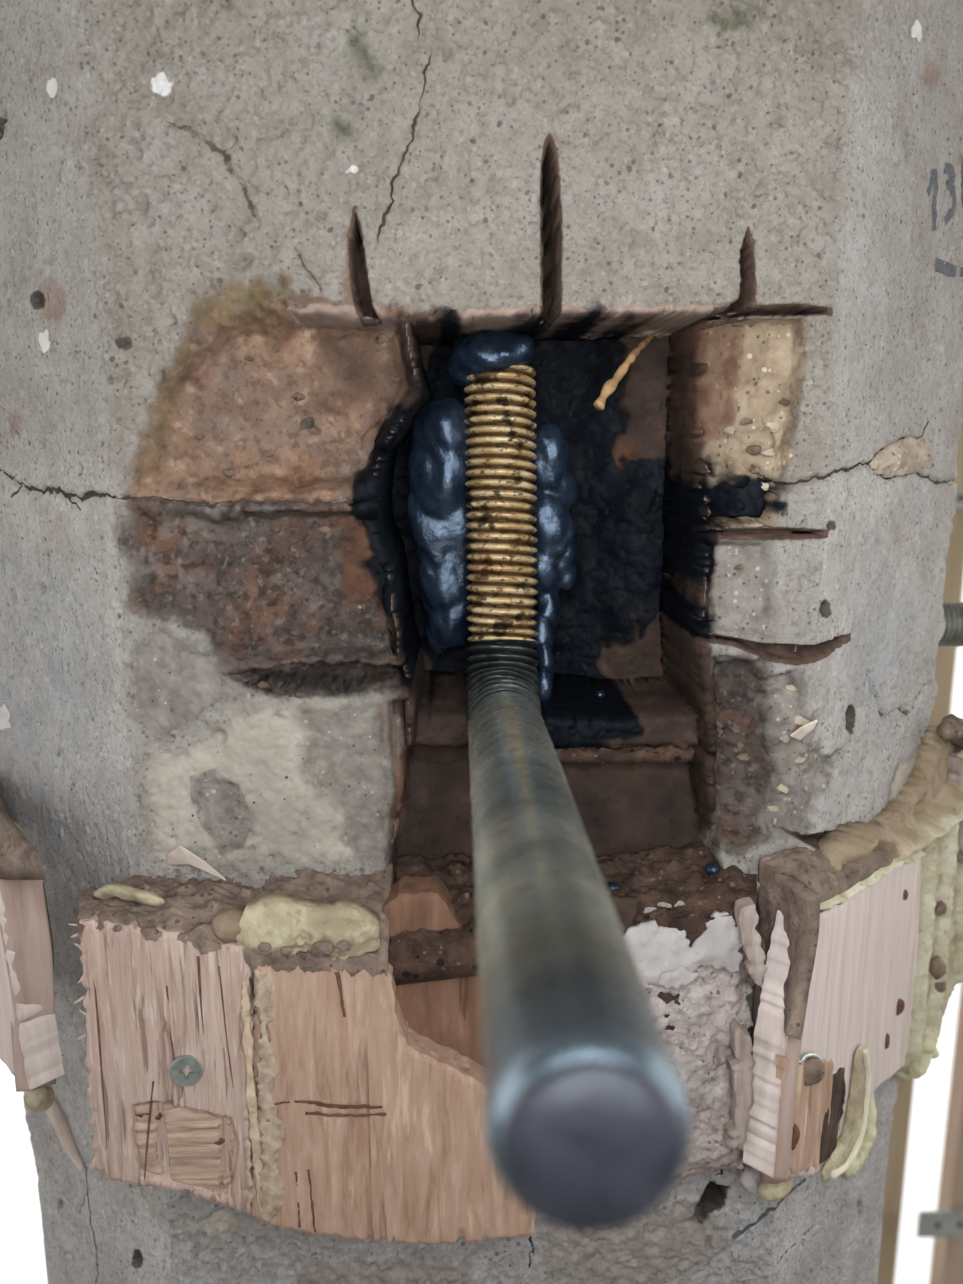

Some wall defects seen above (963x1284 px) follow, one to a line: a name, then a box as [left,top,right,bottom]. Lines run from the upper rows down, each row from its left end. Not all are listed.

crack [166,121,259,223]
crack [376,0,432,245]
crack [294,247,322,295]
crack [0,469,348,510]
spalling [673,315,807,636]
crack [730,421,954,497]
spalling [121,294,416,881]
spalling [820,599,831,618]
spalling [707,657,833,853]
peeling [609,894,743,1030]